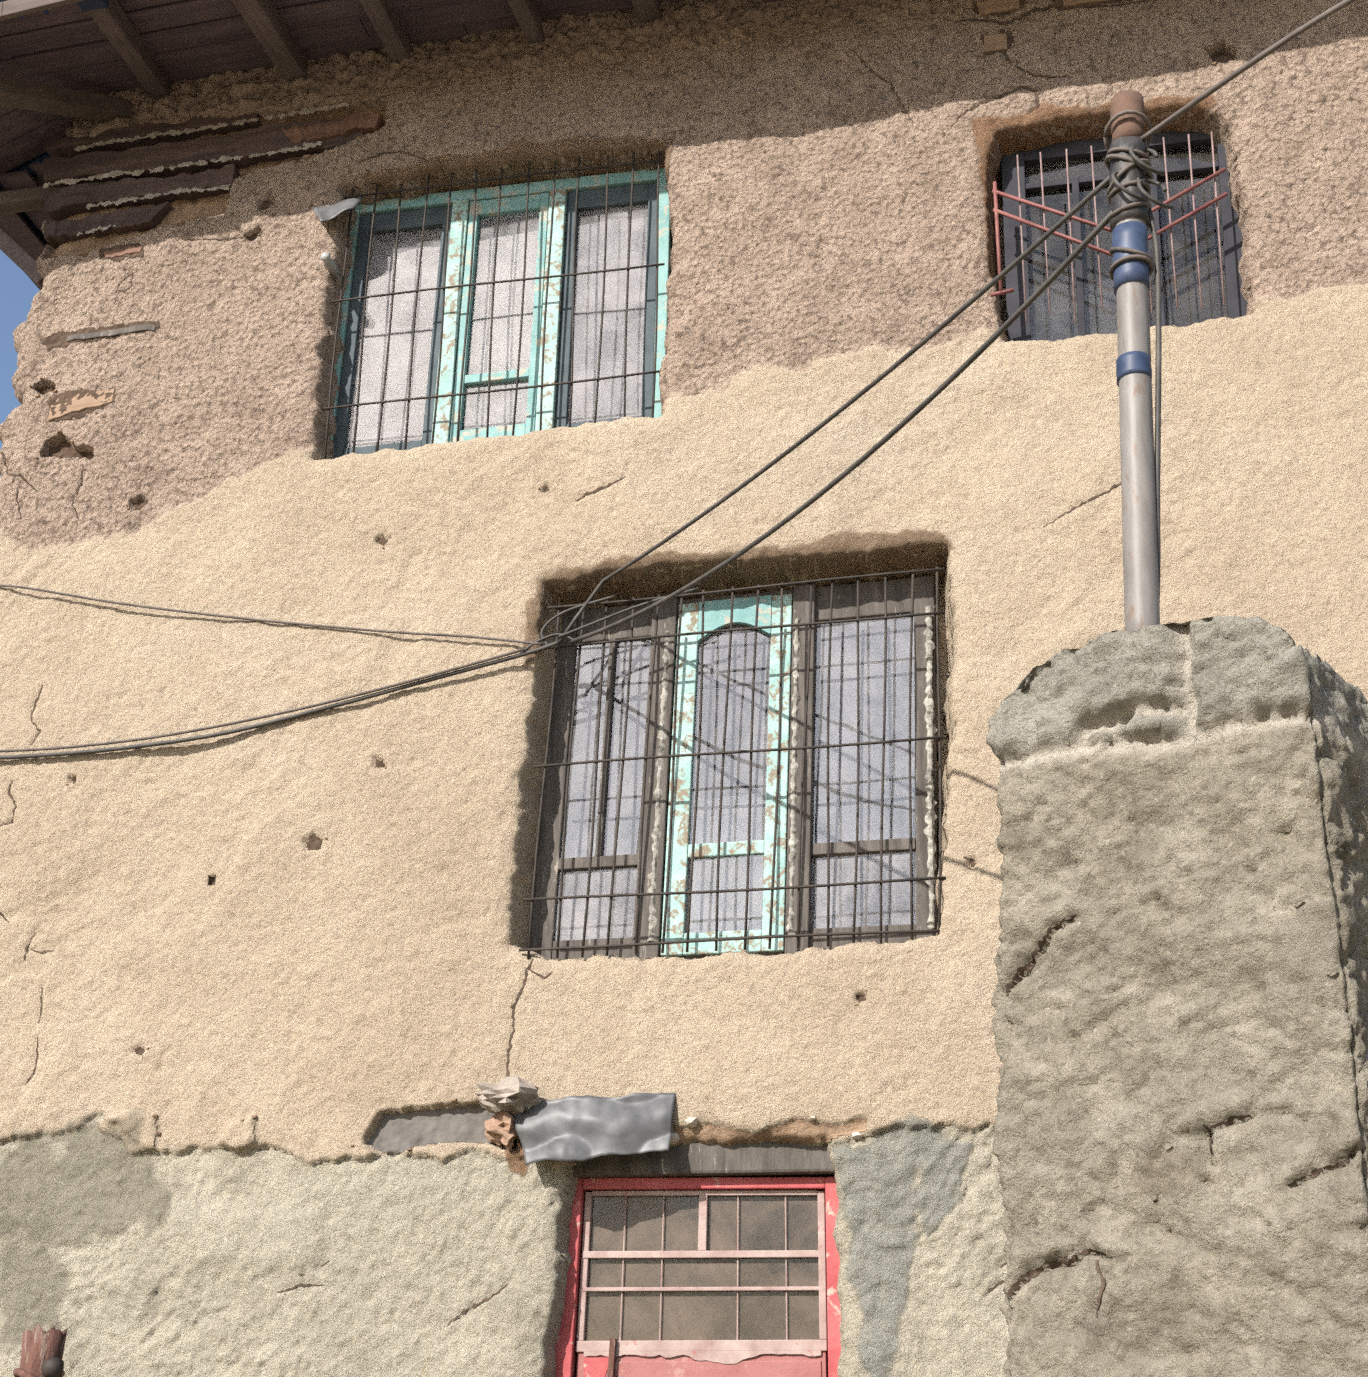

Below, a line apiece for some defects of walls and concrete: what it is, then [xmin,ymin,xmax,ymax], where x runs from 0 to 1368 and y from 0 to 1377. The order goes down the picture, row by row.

crack [950,0,1146,128]
flaking render [74,103,386,151]
flaking render [43,141,327,261]
crack [1005,915,1077,995]
crack [0,912,53,1084]
crack [506,958,553,1077]
peeling [97,1113,161,1155]
peeling [218,1115,258,1152]
flaking render [350,1098,503,1157]
crack [1203,1115,1251,1162]
crack [1287,1145,1357,1186]
crack [982,1249,1107,1317]